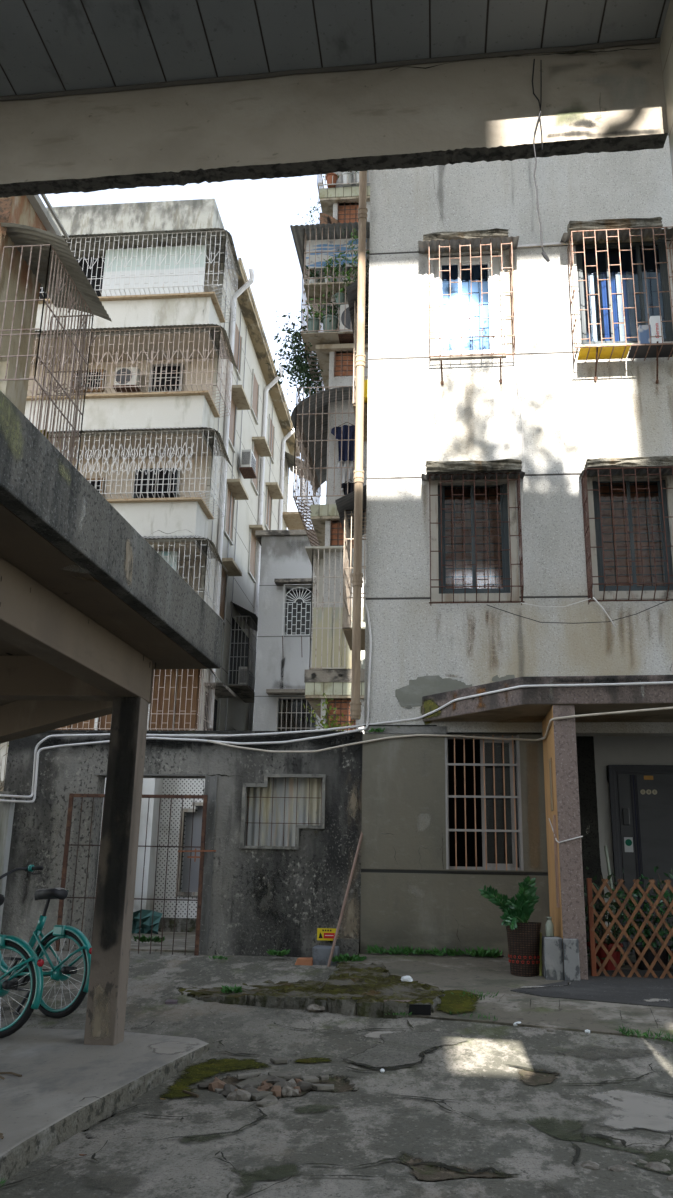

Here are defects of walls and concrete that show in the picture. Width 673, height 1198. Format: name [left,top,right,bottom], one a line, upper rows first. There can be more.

water stain [548,119,658,136]
spalling [239,1076,359,1102]